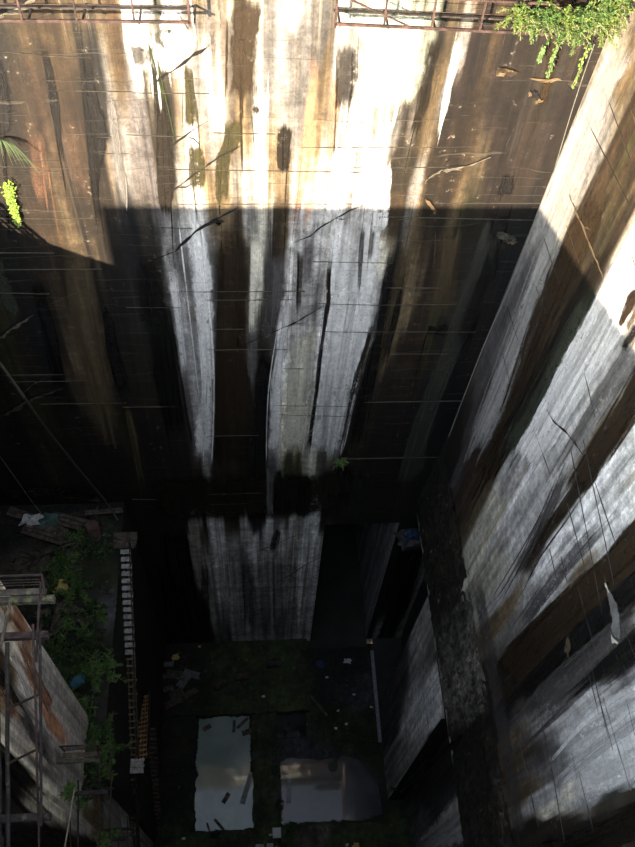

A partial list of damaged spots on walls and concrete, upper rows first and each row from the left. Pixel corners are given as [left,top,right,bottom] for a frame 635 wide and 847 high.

leakage [0,90,10,230]
crack [153,207,238,261]
leakage [120,0,404,529]
rust [294,85,317,209]
crack [293,200,372,243]
leakage [270,530,281,553]